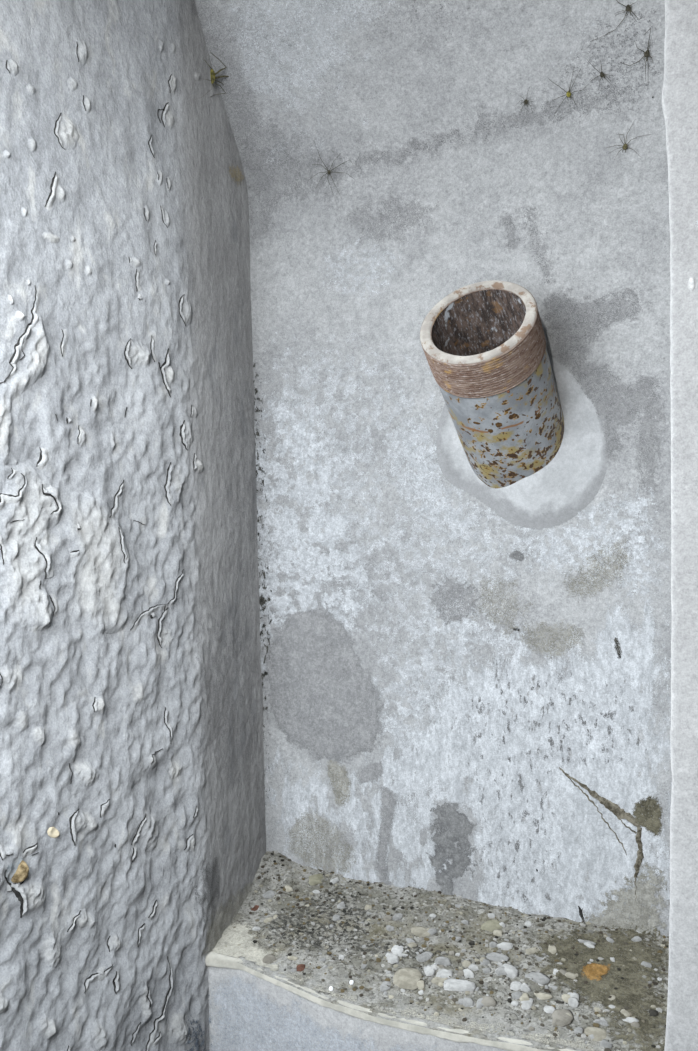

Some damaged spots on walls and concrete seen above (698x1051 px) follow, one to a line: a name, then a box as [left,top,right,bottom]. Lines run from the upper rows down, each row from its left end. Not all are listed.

crack [148,102,175,158]
crack [45,172,65,210]
crack [0,285,40,383]
crack [150,335,197,418]
crack [42,484,62,520]
crack [164,453,203,506]
damp [194,206,672,929]
crack [130,569,184,649]
crack [131,811,159,862]
crack [0,843,47,918]
crack [84,900,158,993]
crack [131,953,174,1051]